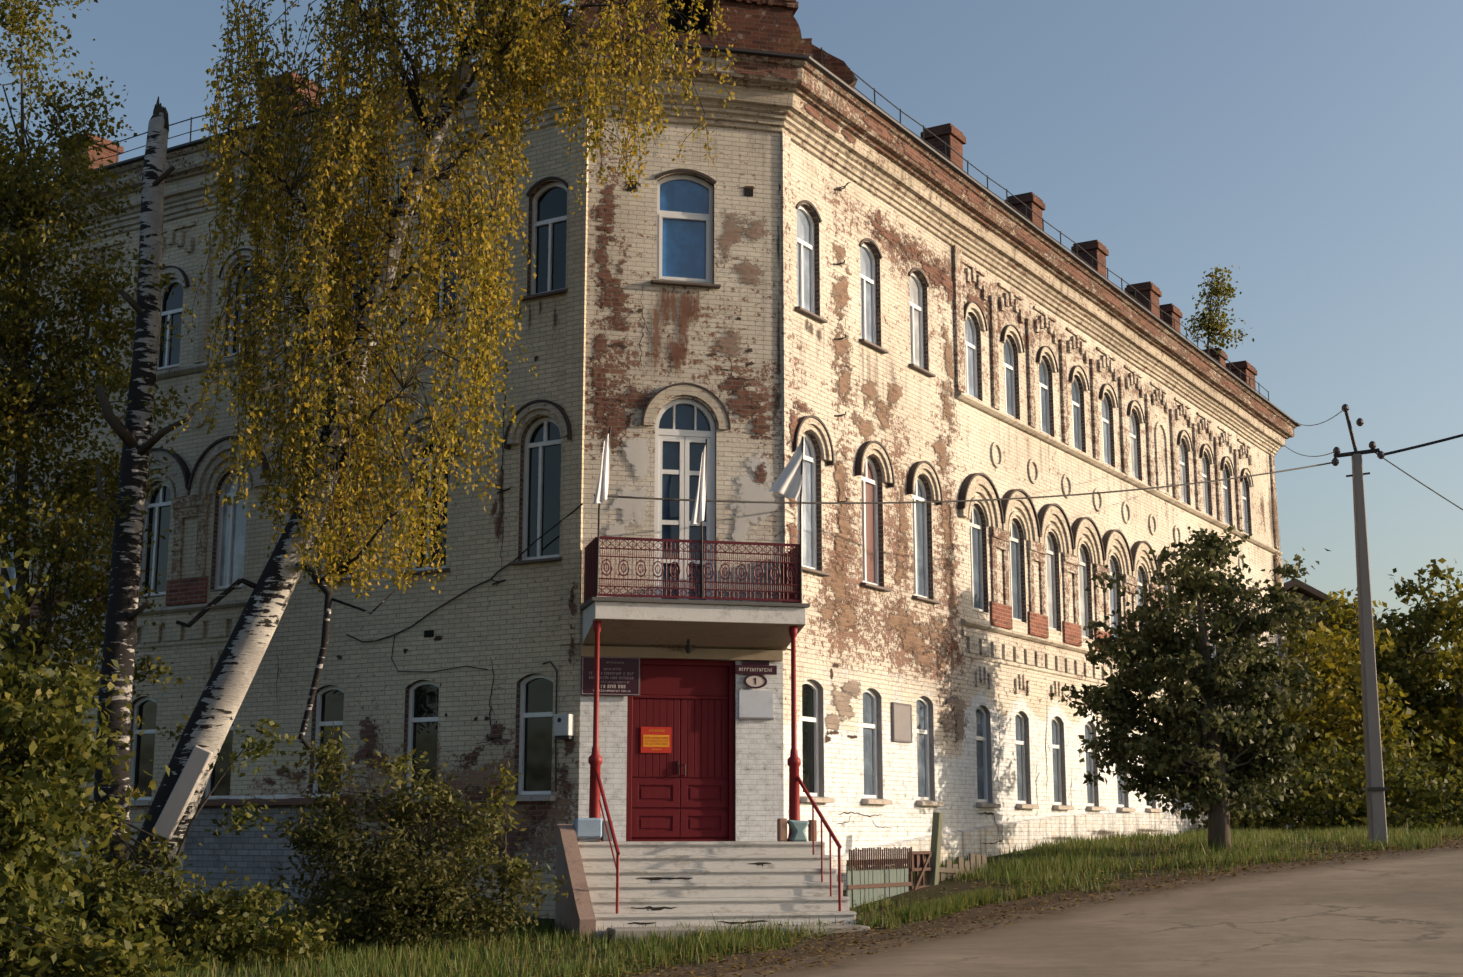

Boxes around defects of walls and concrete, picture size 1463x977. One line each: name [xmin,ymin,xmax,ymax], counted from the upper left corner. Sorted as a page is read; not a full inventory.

spalling [718,186,769,291]
spalling [588,178,651,541]
spalling [816,205,1040,673]
spalling [568,582,577,664]
spalling [351,717,388,773]
spalling [367,716,576,870]
spalling [826,663,861,743]
spalling [938,691,971,754]